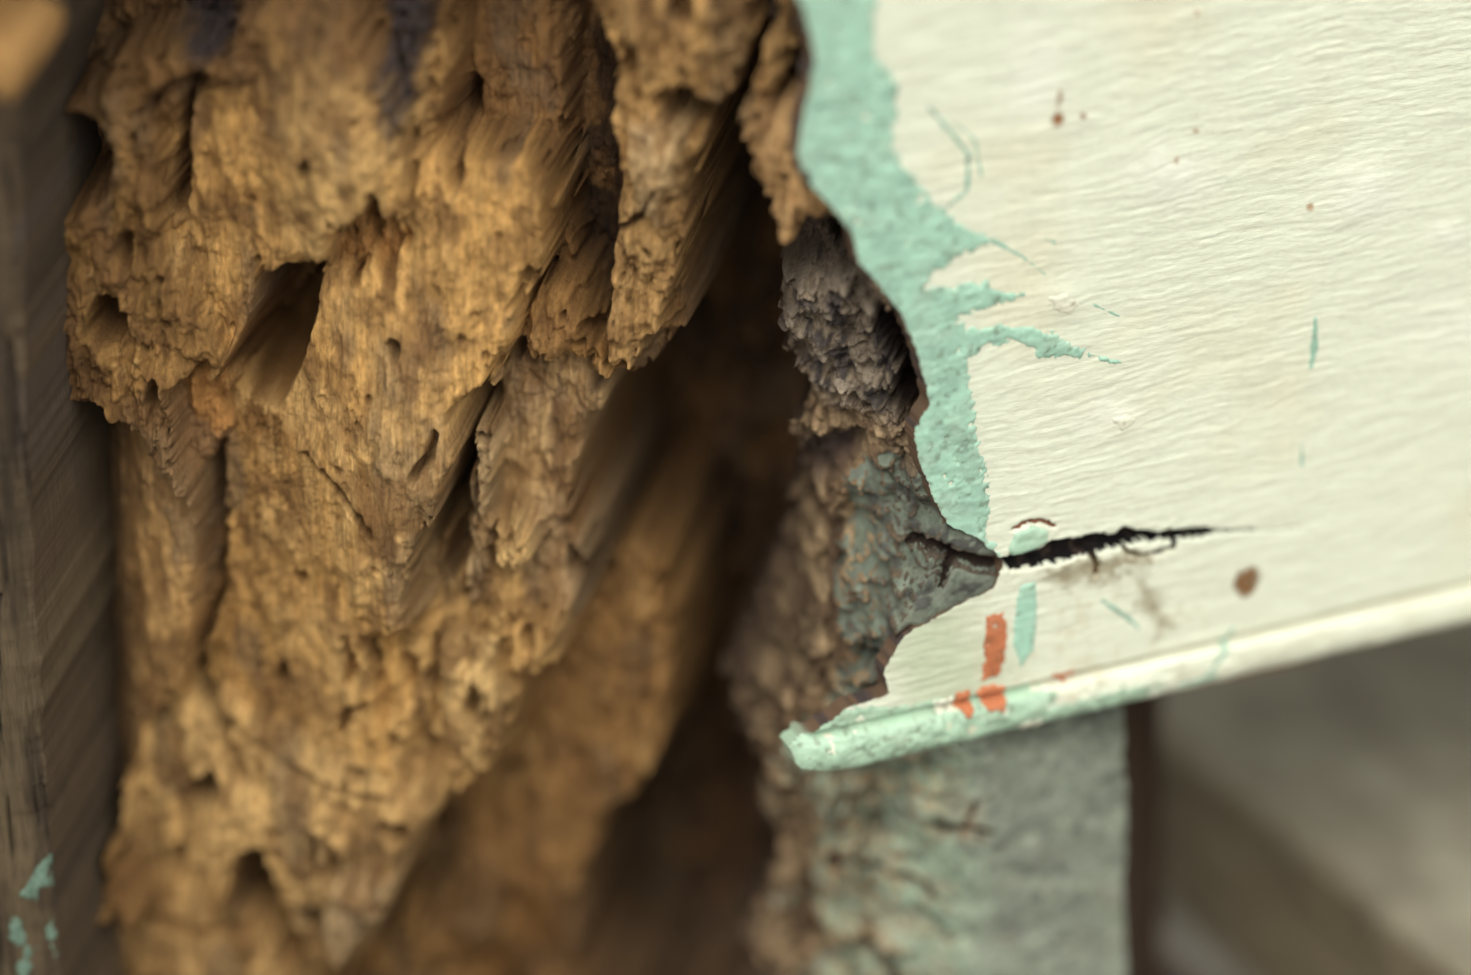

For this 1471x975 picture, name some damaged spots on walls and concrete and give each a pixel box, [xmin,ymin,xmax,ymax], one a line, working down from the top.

peeling [1309,317,1318,369]
peeling [111,0,1235,975]
crack [904,519,1257,587]
peeling [19,853,55,902]
peeling [3,917,59,975]